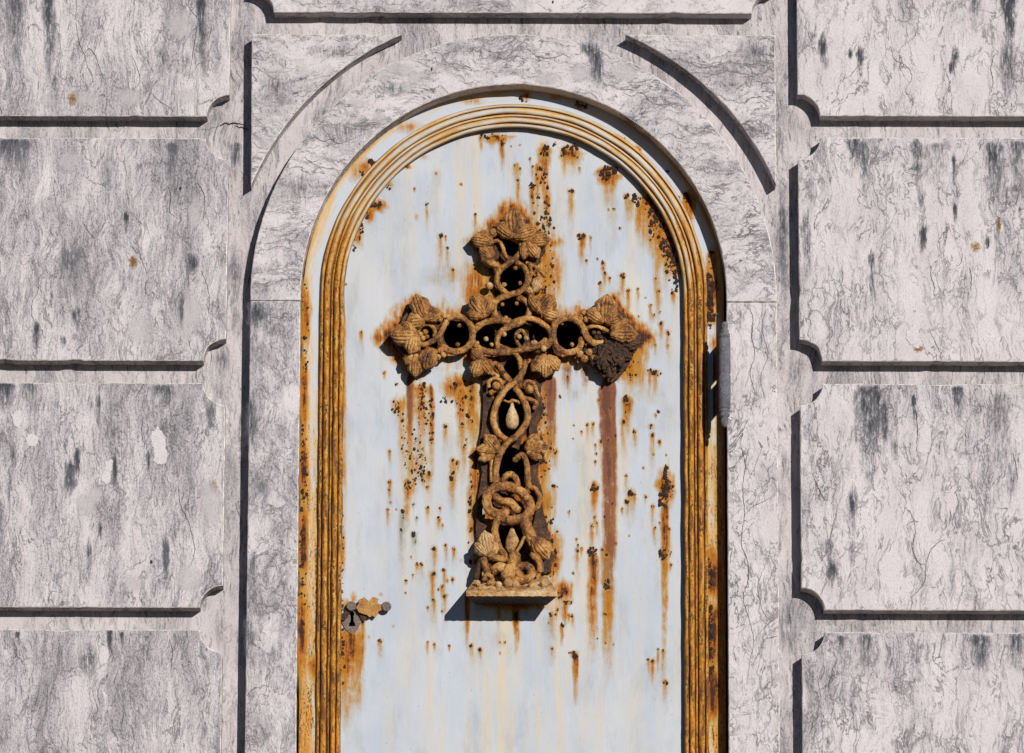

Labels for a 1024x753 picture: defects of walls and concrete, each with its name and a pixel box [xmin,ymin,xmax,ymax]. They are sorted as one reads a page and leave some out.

rust [430,133,581,327]
rust [679,191,697,222]
rust [706,250,720,350]
rust [297,283,317,678]
rust [360,165,681,689]
rust [341,621,365,712]
rust [568,650,579,698]
rust [708,545,723,722]